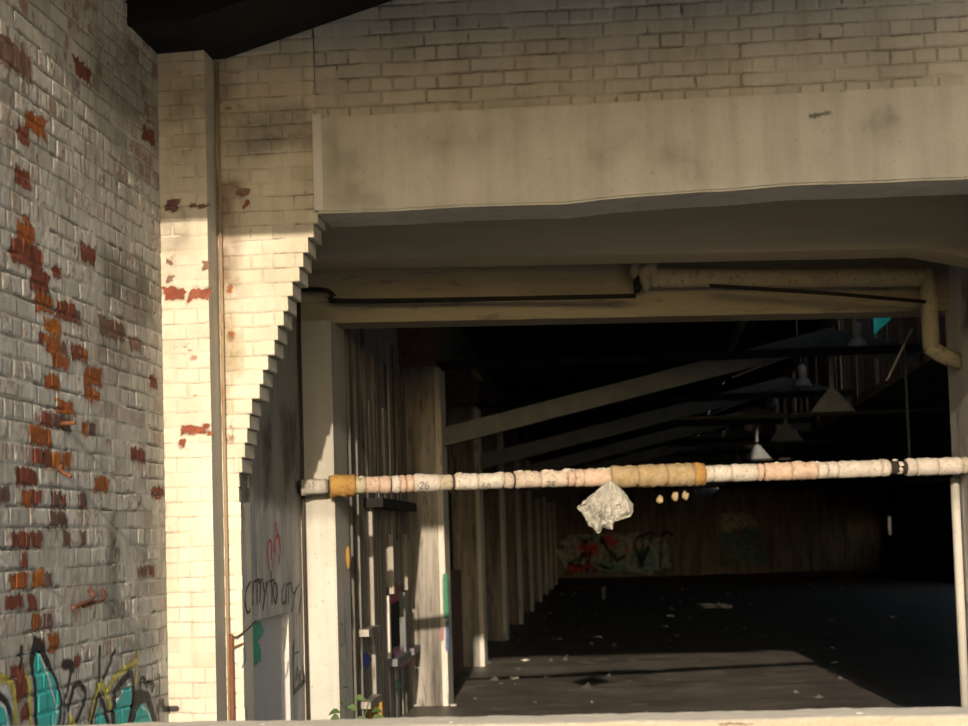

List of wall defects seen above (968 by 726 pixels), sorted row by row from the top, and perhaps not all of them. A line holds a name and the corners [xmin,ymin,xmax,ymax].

peeling [0,34,32,84]
peeling [72,54,92,88]
peeling [16,110,48,147]
peeling [15,164,32,191]
peeling [165,199,209,213]
peeling [161,259,212,303]
peeling [98,314,142,355]
peeling [0,214,102,654]
peeling [179,423,213,448]
peeling [130,446,145,464]
peeling [78,475,110,510]
peeling [151,484,164,500]